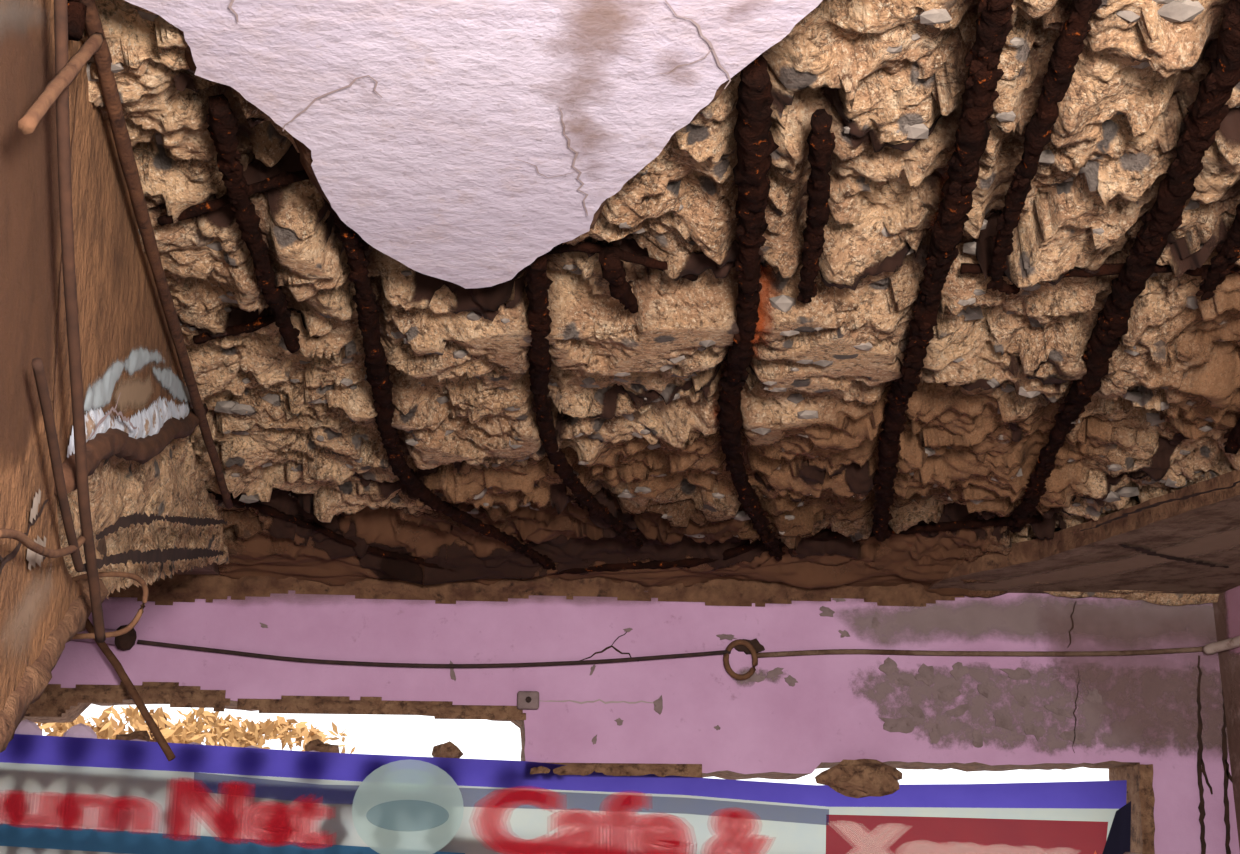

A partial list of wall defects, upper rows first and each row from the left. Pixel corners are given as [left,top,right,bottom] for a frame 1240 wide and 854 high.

crack [973,210,1011,281]
spalling [84,0,1240,653]
rust [751,264,771,348]
crack [555,353,758,441]
crack [352,460,465,500]
crack [82,483,877,585]
crack [755,458,877,502]
crack [918,433,1240,568]
spalling [0,425,526,753]
peeling [653,695,663,715]
peeling [736,667,798,687]
crack [1197,656,1233,854]